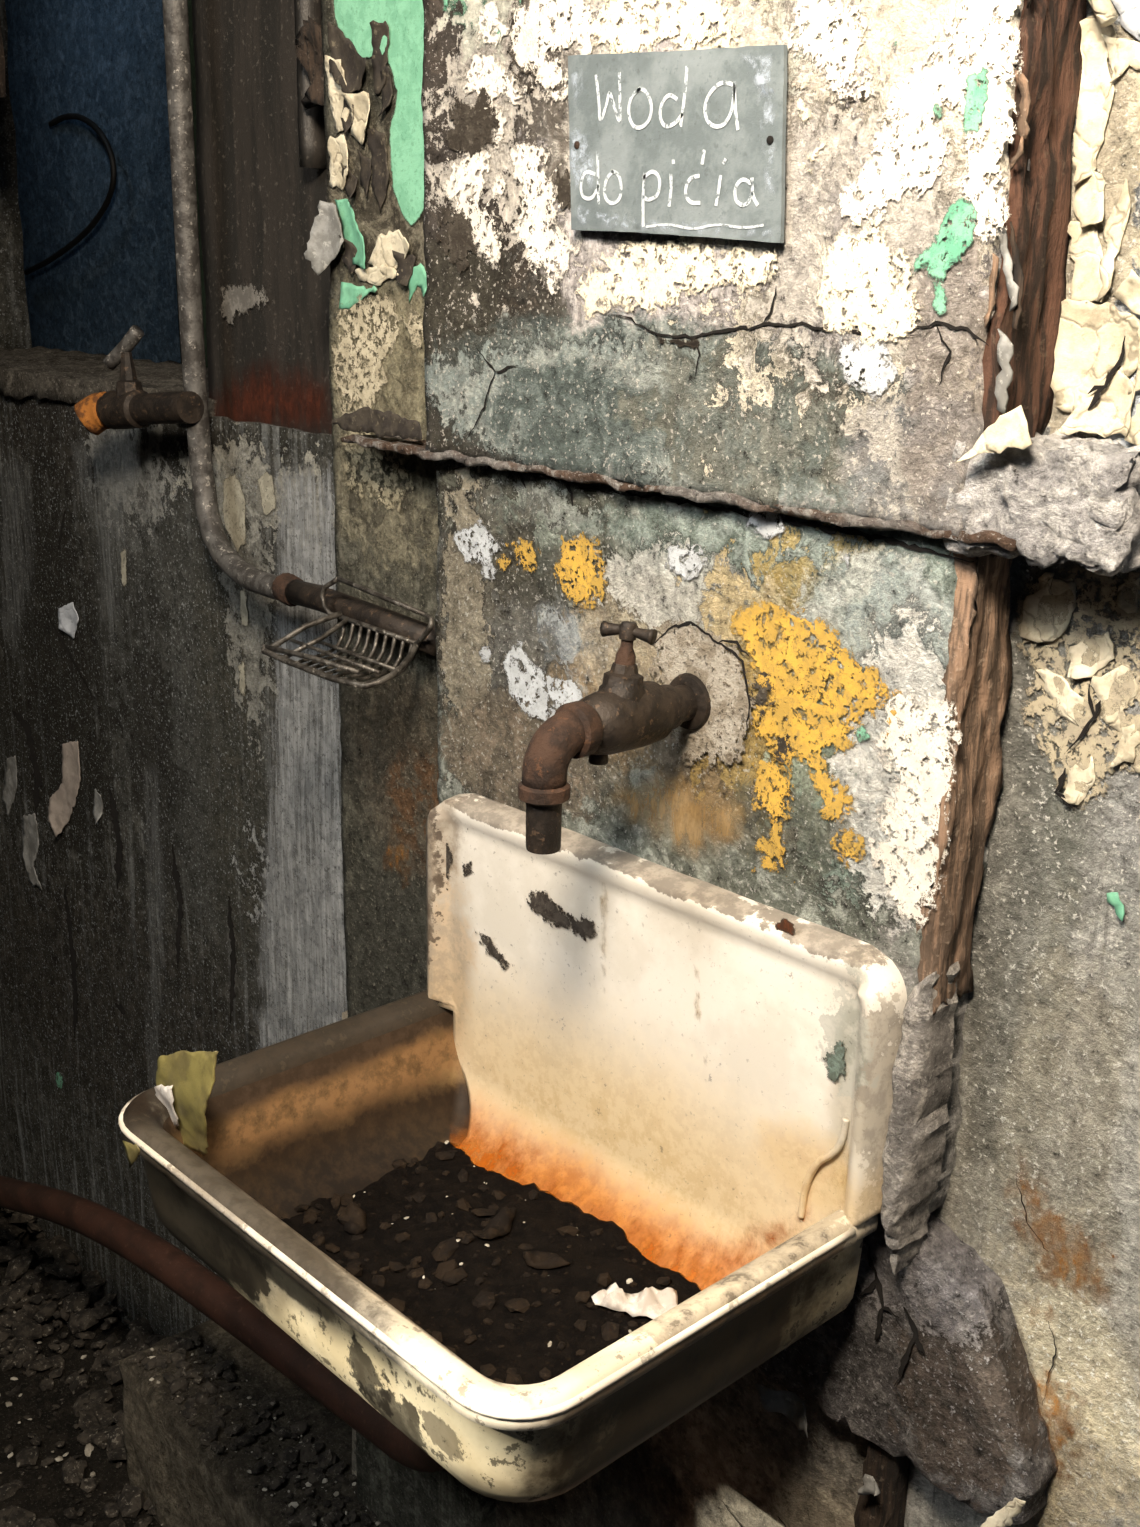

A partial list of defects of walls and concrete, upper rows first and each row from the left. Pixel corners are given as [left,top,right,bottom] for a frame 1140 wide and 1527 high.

peeling [304,0,780,512]
peeling [786,0,1024,402]
peeling [1050,0,1140,445]
crack [611,289,989,385]
peeling [955,405,1032,463]
peeling [453,519,608,613]
peeling [479,639,583,722]
peeling [1012,566,1140,811]
peeling [2,741,103,890]
peeling [649,598,963,929]
peeling [474,930,517,977]
peeling [980,1498,1026,1527]